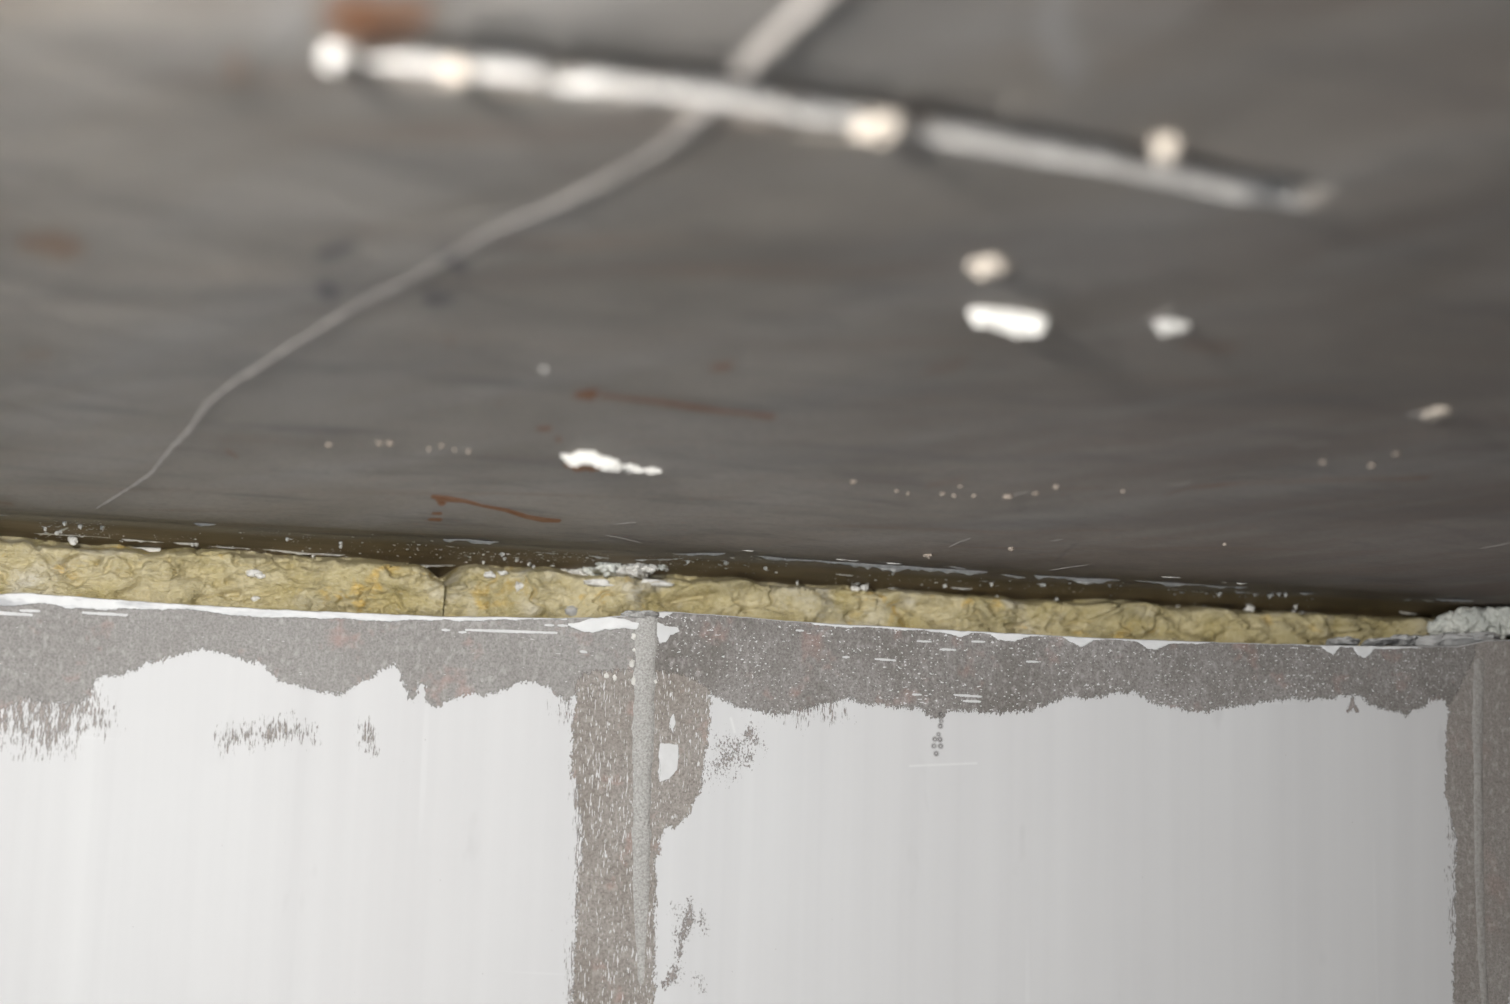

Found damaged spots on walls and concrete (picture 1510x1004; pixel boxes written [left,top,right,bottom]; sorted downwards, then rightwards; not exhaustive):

corrosion [568,383,782,422]
corrosion [426,493,564,524]
water stain [441,624,568,634]
water stain [917,640,986,651]
water stain [953,694,982,703]